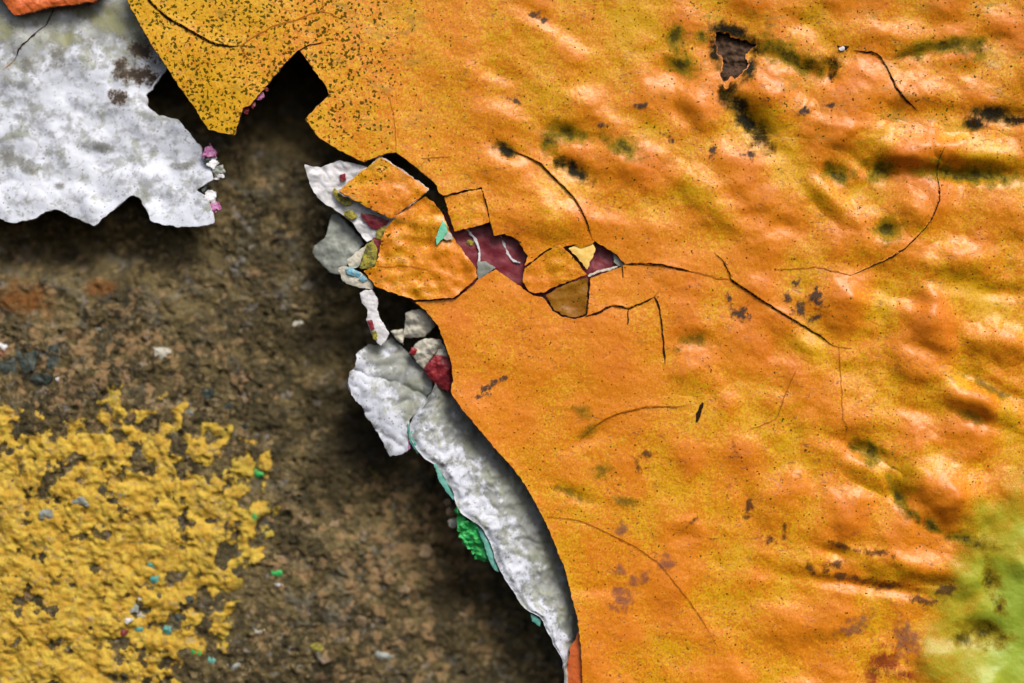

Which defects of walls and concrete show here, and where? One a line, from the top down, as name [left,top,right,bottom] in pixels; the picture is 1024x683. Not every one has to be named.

spalling [715,32,756,81]
crack [853,50,917,111]
crack [517,152,593,240]
crack [776,147,945,276]
spalling [0,0,624,683]
crack [586,292,666,359]
crack [622,255,852,439]
damp [806,474,1024,683]